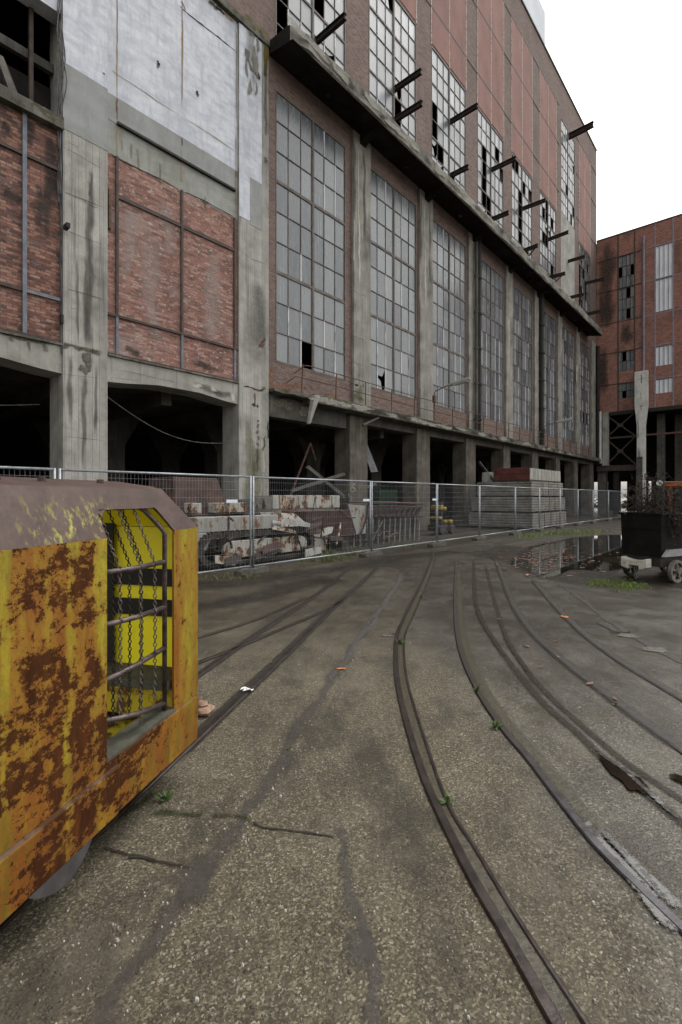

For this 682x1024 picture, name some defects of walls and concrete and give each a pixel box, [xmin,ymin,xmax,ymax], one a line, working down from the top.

peeling [245,21,262,95]
leakage [76,190,93,336]